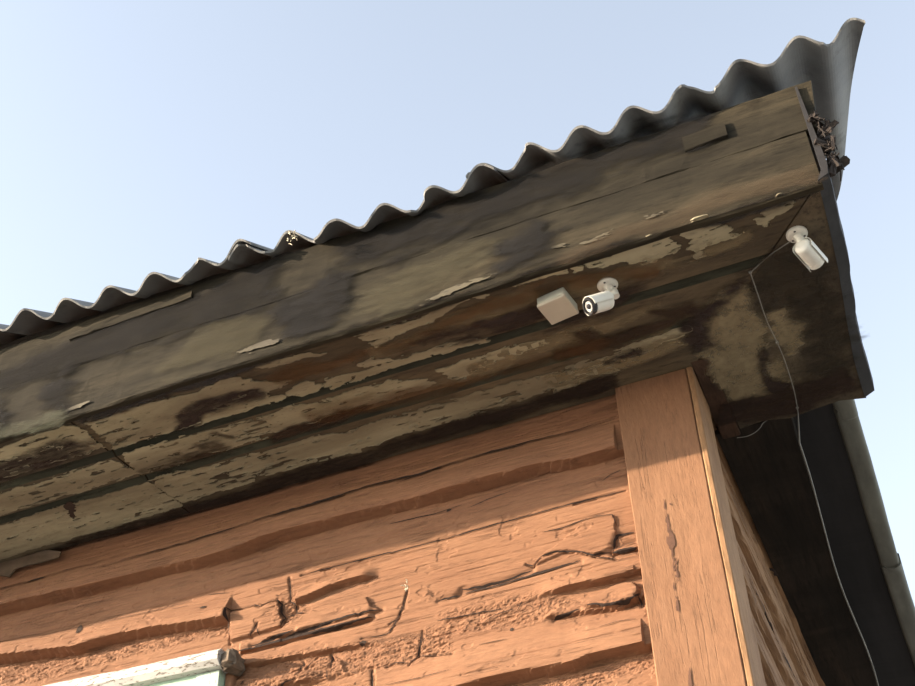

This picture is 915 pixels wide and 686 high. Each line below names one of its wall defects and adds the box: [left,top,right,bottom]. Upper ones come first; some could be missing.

leakage [0,114,710,424]
peeling [512,214,744,287]
peeling [753,193,796,227]
crack [3,418,612,588]
peeling [0,272,693,577]
crack [94,470,643,686]
leakage [46,252,862,552]